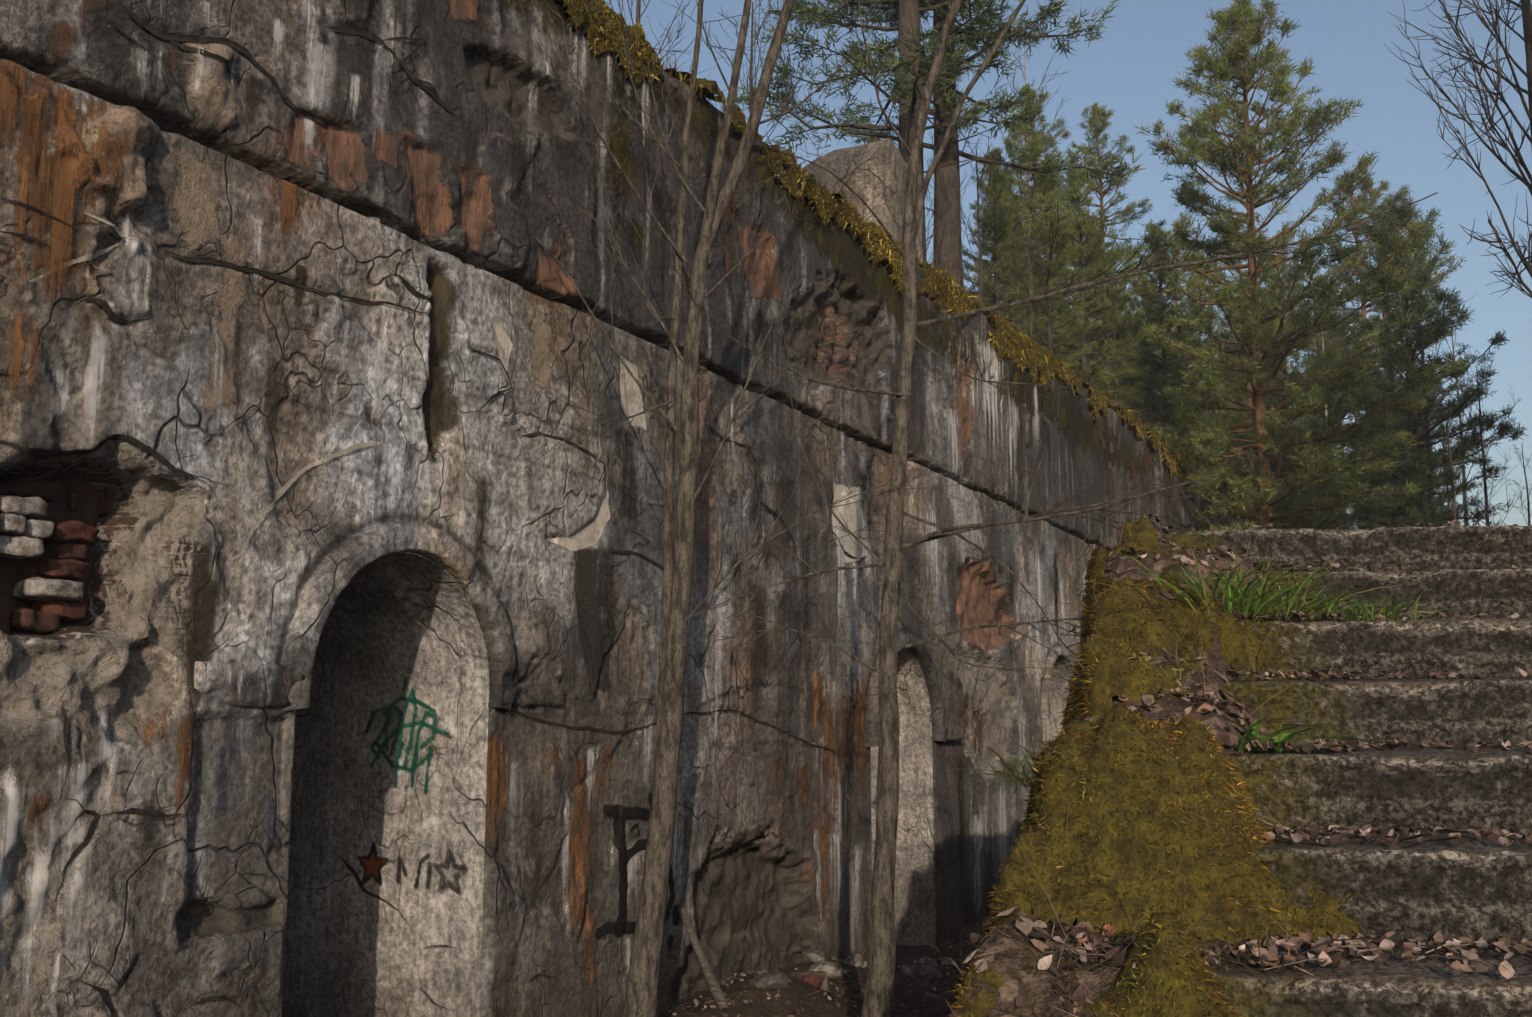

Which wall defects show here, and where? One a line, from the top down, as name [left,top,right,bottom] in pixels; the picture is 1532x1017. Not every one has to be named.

rust [0,60,138,300]
crack [161,249,431,315]
spalling [735,221,897,397]
spalling [0,440,209,746]
spalling [956,555,1017,789]
efflorescence [0,779,19,918]
efflorescence [25,714,116,982]
crack [74,982,116,1017]
crack [55,700,190,901]
rust [486,735,516,837]
spalling [668,827,816,1005]
rust [802,674,870,933]